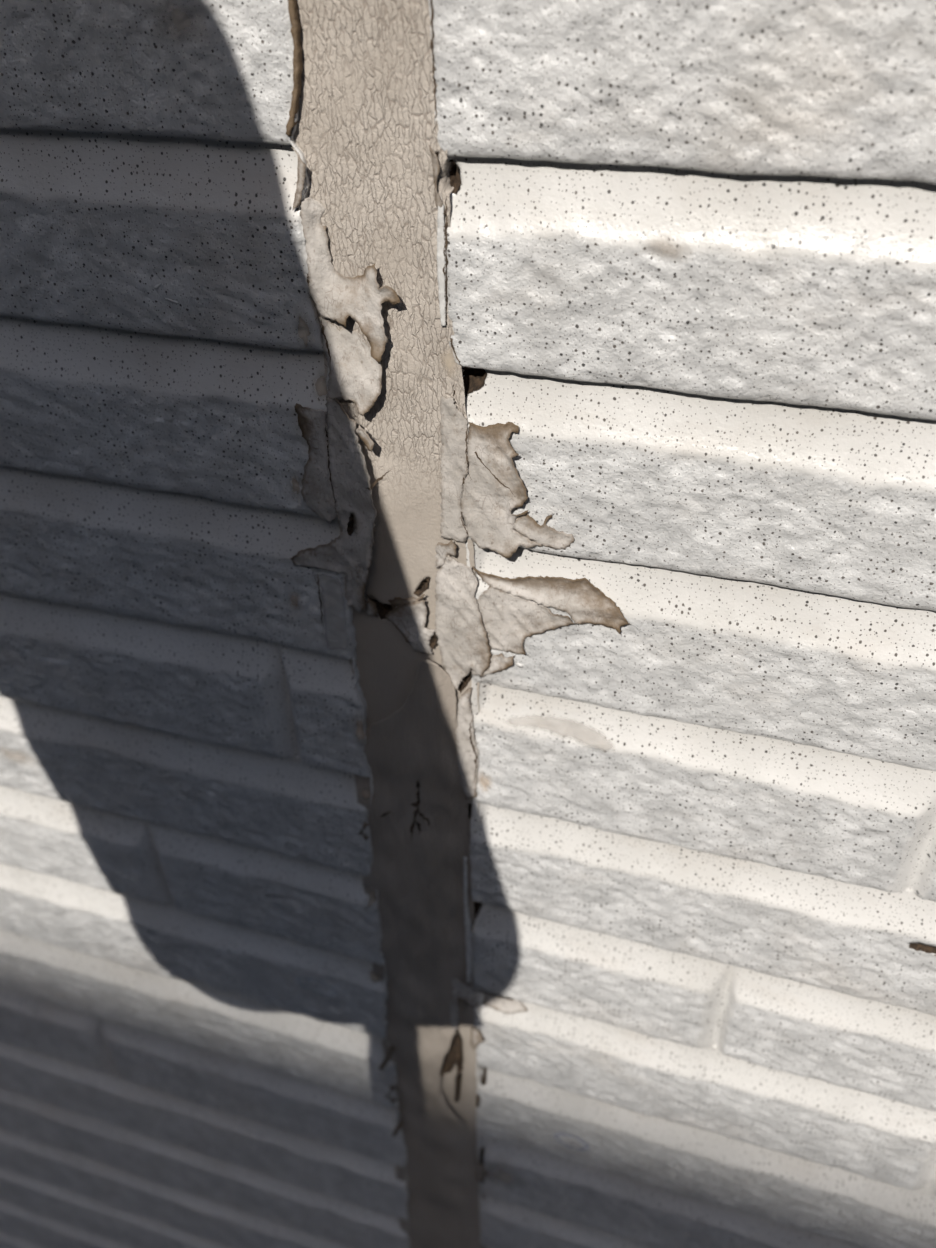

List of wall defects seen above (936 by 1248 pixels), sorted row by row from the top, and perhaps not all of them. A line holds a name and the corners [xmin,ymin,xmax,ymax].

peeling [290,197,401,613]
peeling [435,396,630,690]